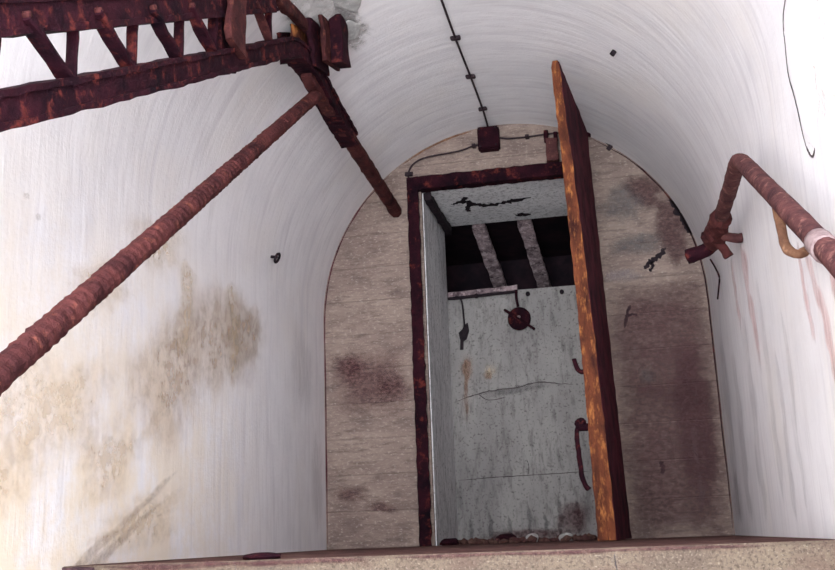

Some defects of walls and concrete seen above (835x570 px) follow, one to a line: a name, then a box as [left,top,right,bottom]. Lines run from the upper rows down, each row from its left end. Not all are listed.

spalling [291,0,364,47]
crack [451,197,531,216]
leakage [620,293,719,526]